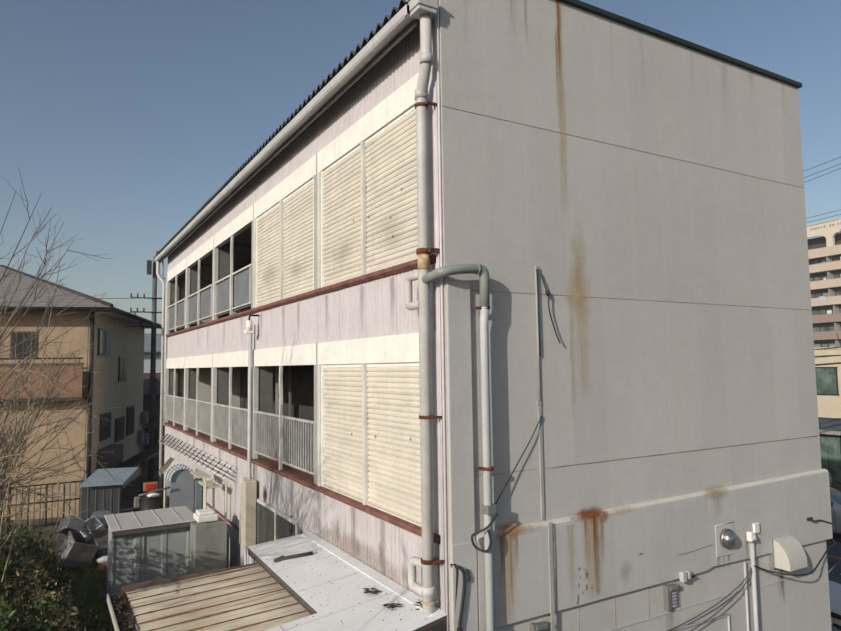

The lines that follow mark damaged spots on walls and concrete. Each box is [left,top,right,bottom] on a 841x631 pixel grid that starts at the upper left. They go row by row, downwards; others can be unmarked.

corrosion [579,509,606,554]